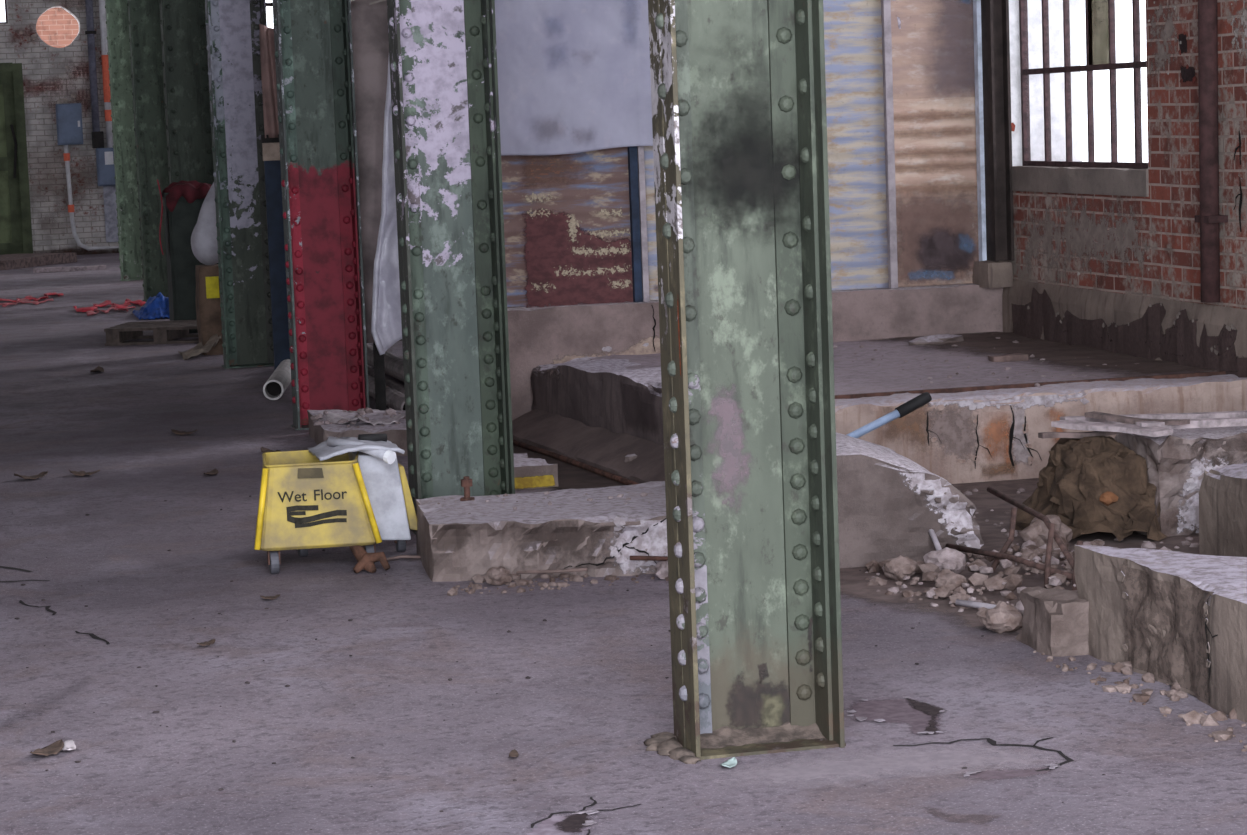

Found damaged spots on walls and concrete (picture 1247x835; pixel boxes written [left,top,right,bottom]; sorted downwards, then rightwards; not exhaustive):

spalling [928,390,1090,465]
spalling [609,517,668,574]
spalling [899,464,1083,590]
crack [0,566,110,644]
crack [531,797,641,835]